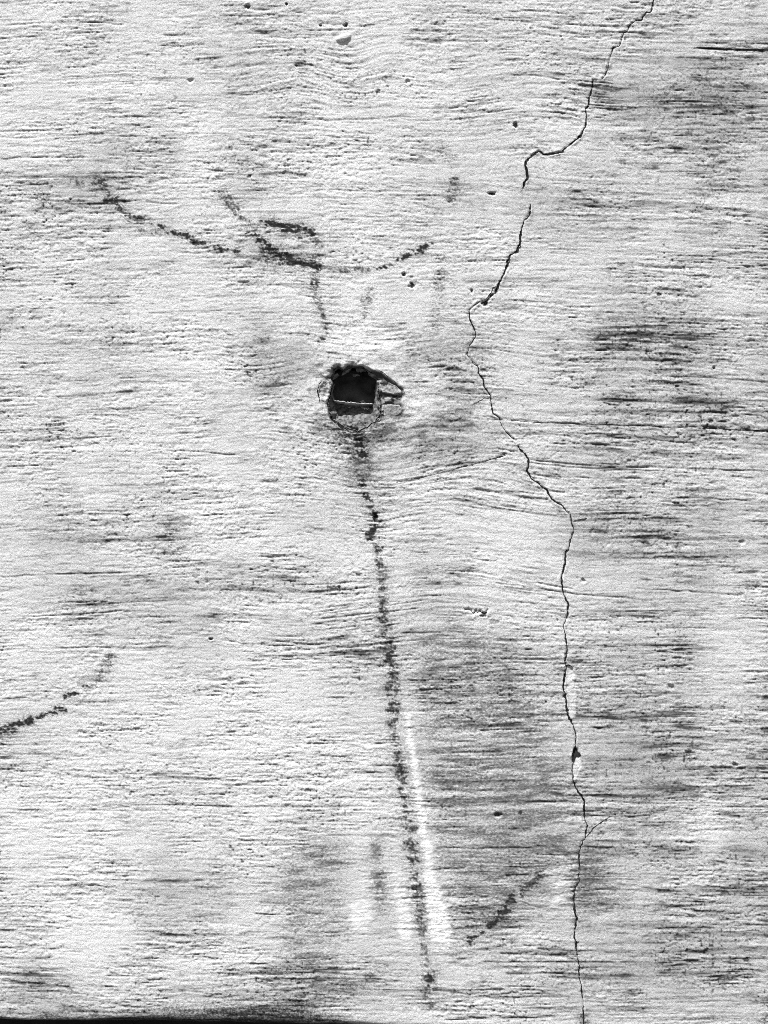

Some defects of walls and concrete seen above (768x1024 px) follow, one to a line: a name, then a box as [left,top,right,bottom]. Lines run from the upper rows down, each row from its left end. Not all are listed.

crack [467,0,654,1024]